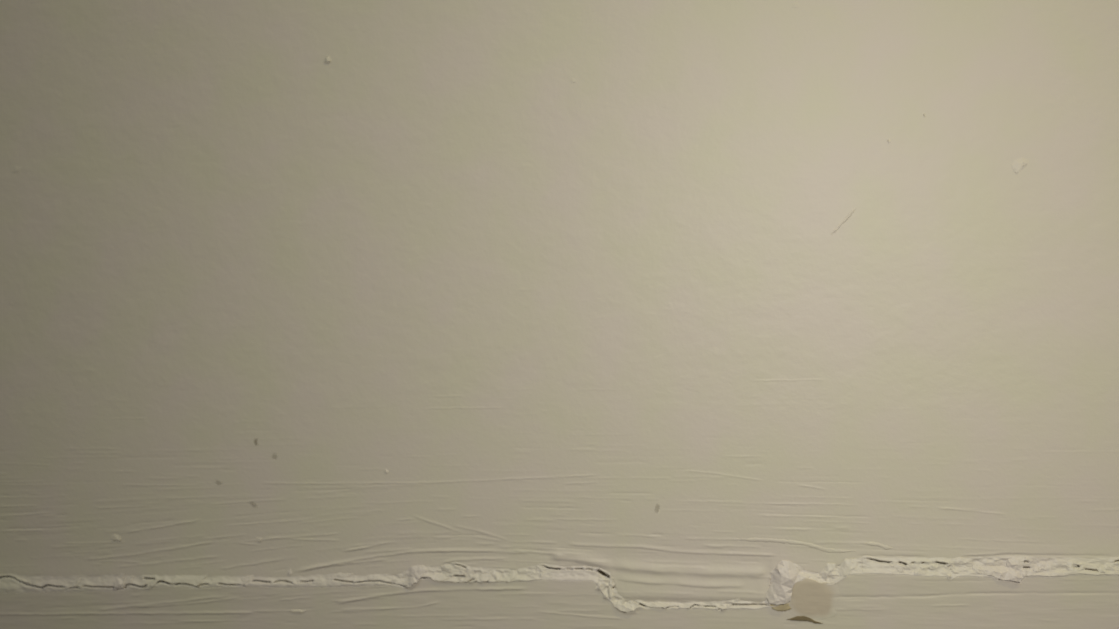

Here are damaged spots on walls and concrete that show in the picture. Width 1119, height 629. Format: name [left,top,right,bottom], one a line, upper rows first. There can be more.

crack [0,576,427,590]
peeling [432,570,517,583]